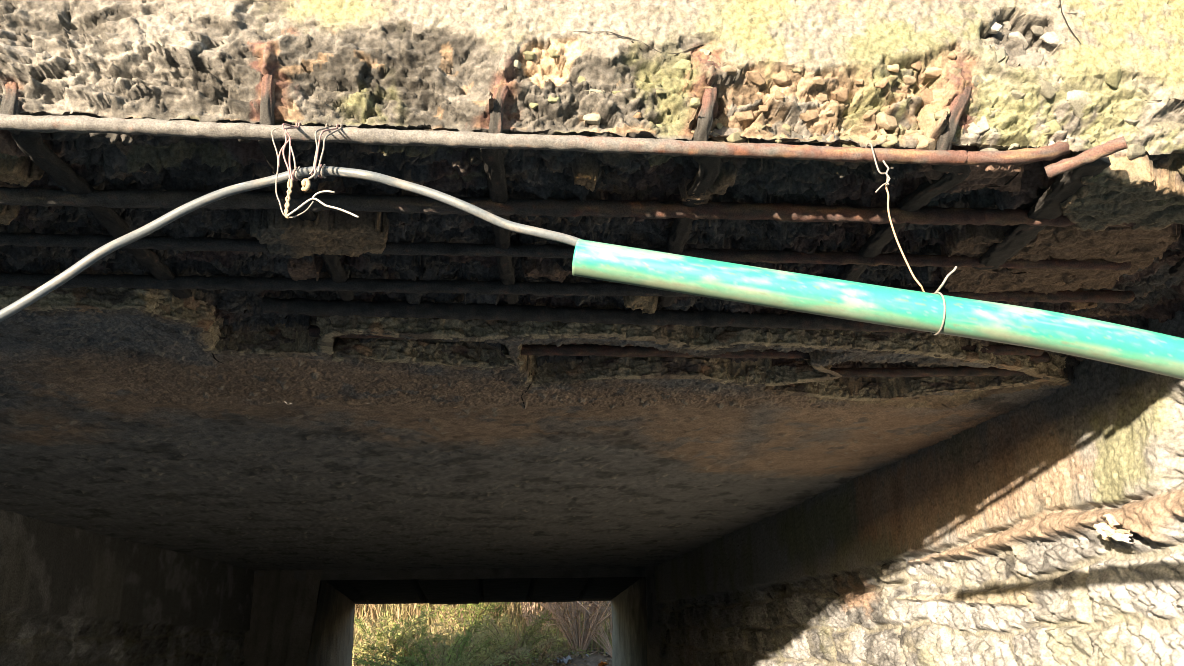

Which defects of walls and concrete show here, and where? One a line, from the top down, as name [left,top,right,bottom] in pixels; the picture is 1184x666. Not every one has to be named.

corrosion [247,40,290,123]
spalling [0,0,1184,410]